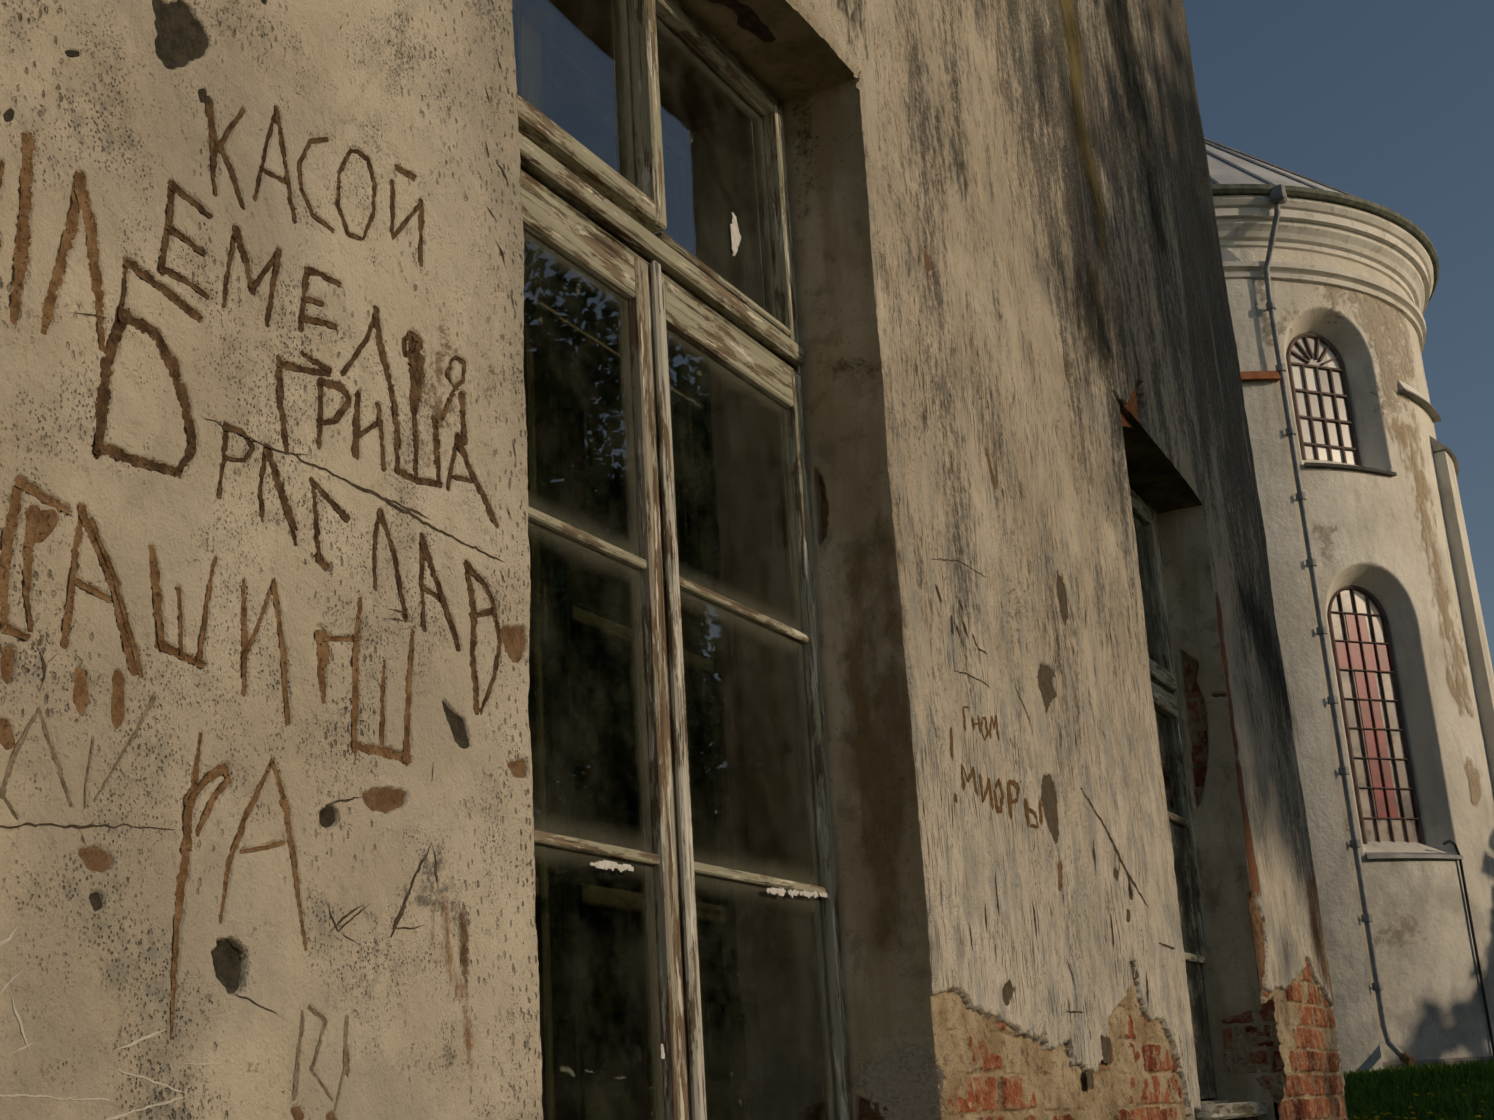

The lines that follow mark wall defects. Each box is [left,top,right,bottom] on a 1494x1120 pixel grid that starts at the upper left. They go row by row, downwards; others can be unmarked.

spalling [152,0,209,70]
water stain [1059,0,1126,408]
water stain [1105,0,1169,262]
crack [202,416,506,583]
water stain [844,522,908,947]
water stain [1234,576,1301,747]
crack [0,822,174,854]
spalling [211,939,241,994]
crack [969,874,1084,1013]
flaking render [928,963,1188,1120]
crack [1080,788,1149,947]
flaking render [1222,892,1348,1120]